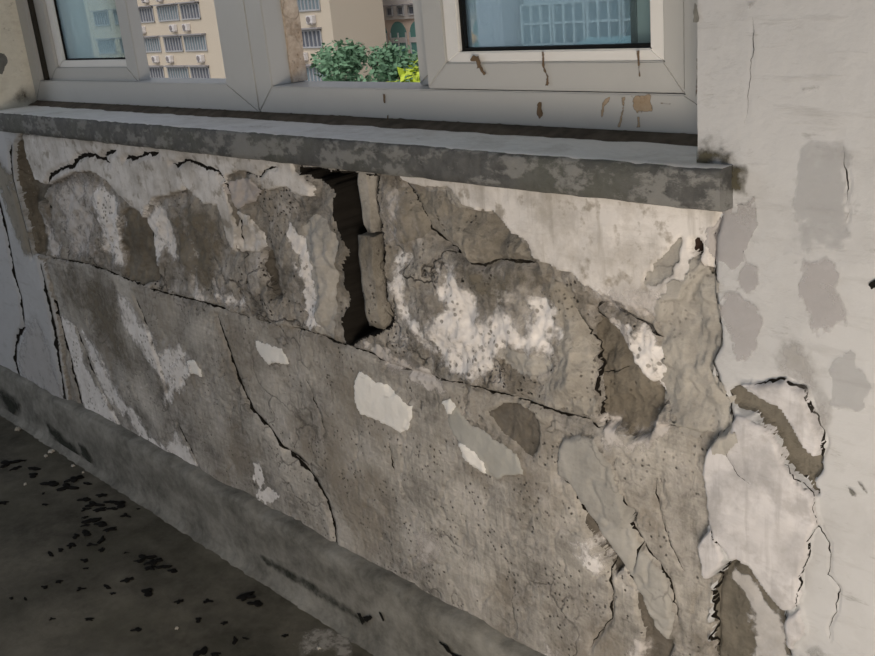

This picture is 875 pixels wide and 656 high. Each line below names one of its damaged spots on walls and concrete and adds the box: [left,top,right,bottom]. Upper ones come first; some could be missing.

rust [618,94,652,127]
water stain [696,149,745,191]
crack [408,182,535,267]
crack [714,216,723,299]
crack [0,145,337,542]
crack [300,328,412,370]
spalling [16,133,826,656]
crack [435,301,664,428]